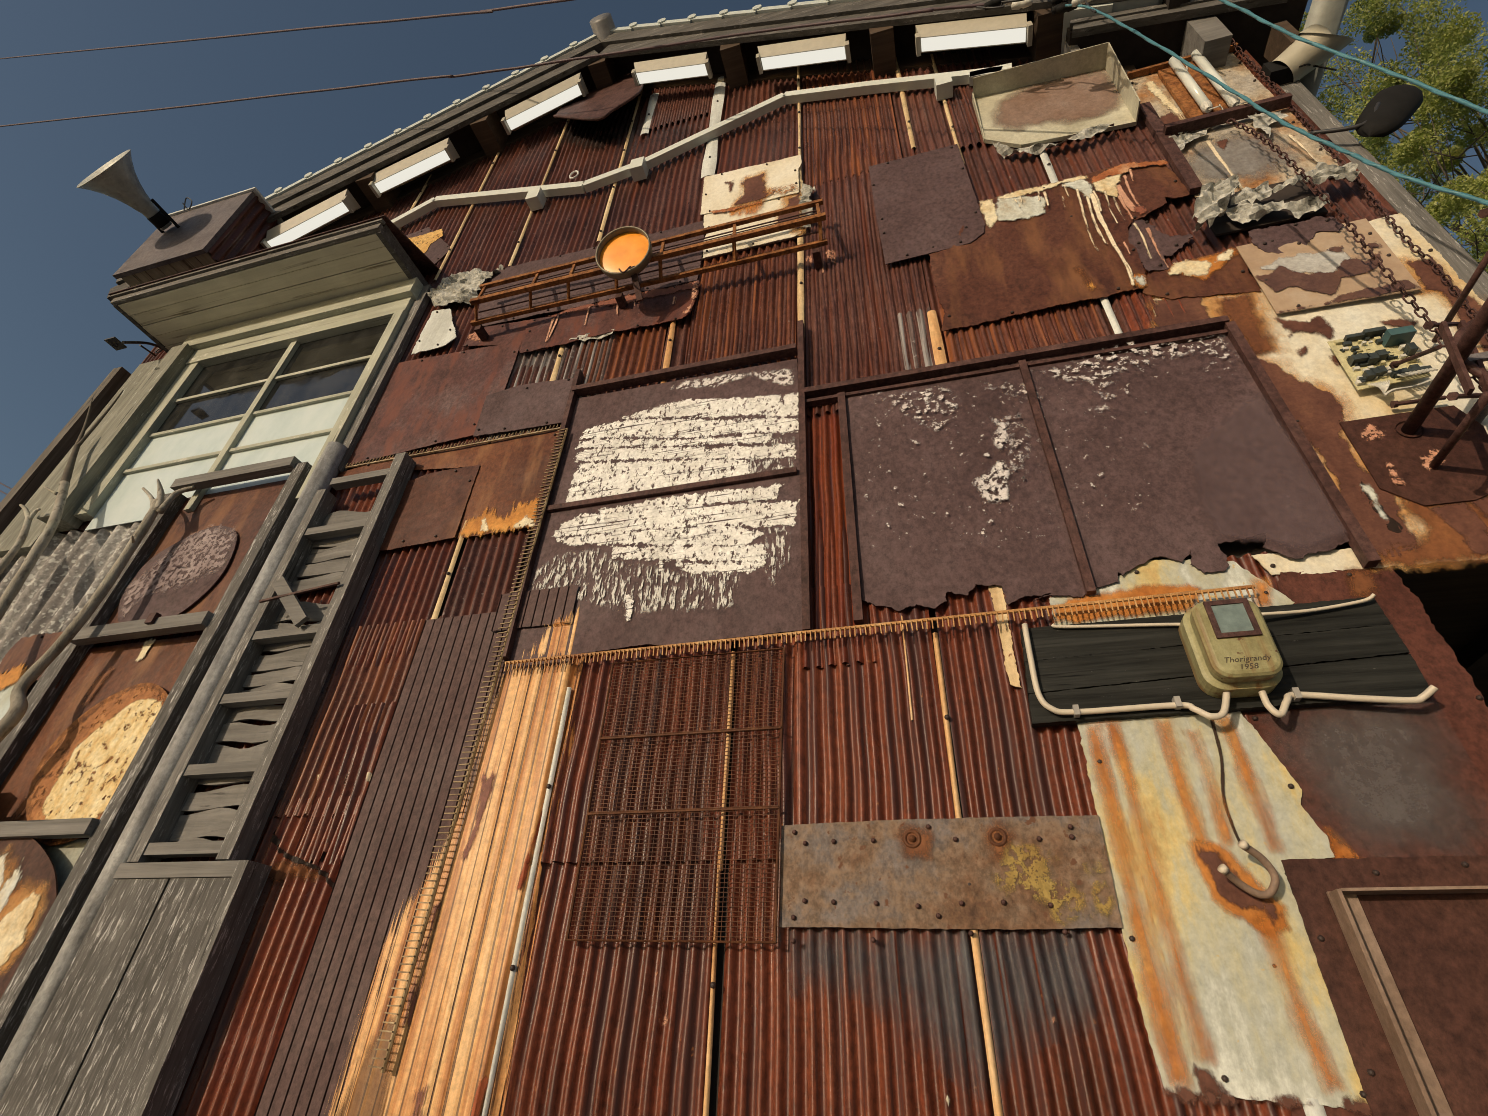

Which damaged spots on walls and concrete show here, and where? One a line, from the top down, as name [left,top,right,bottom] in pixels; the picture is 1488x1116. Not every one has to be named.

rust [711,172,802,233]
peeling [1133,274,1146,287]
rust [1400,259,1482,323]
peeling [875,339,1230,541]
rust [1153,292,1488,597]
rust [1055,584,1200,623]
peeling [28,684,164,820]
peeling [328,369,800,1116]
peeling [0,853,43,972]
rust [986,718,1312,1110]
rust [1162,724,1372,1116]